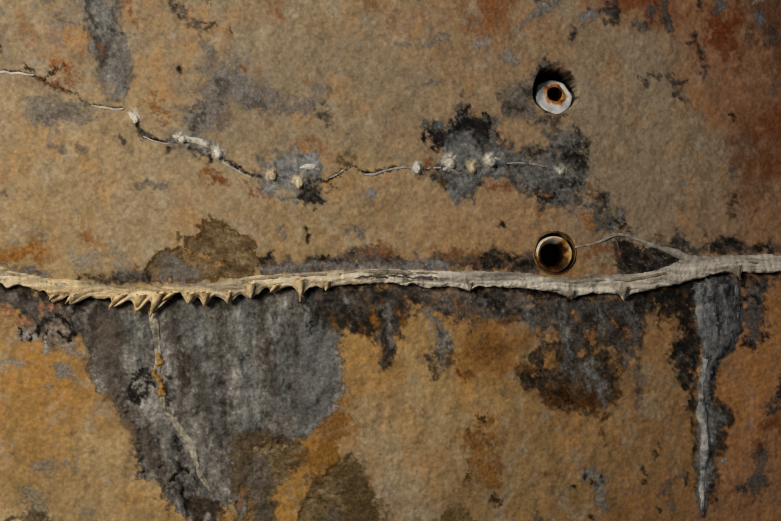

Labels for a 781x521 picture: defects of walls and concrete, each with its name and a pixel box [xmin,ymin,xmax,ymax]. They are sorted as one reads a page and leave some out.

crack [0,64,568,210]
leakage [421,58,781,274]
crack [0,233,781,317]
leakage [144,304,213,498]
peeling [16,288,387,521]
leakage [299,274,781,521]